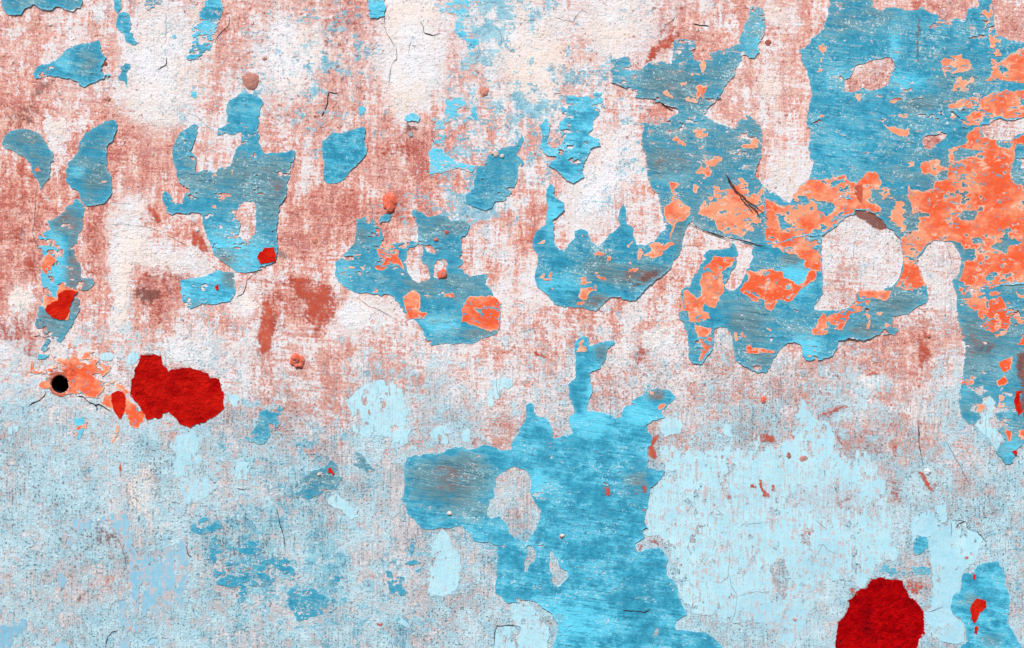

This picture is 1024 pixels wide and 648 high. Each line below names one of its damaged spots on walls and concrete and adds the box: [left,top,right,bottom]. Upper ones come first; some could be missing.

peeling [1,93,295,504]
peeling [335,209,502,345]
crack [725,173,768,220]
peeling [532,0,1024,464]
peeling [345,336,1022,648]